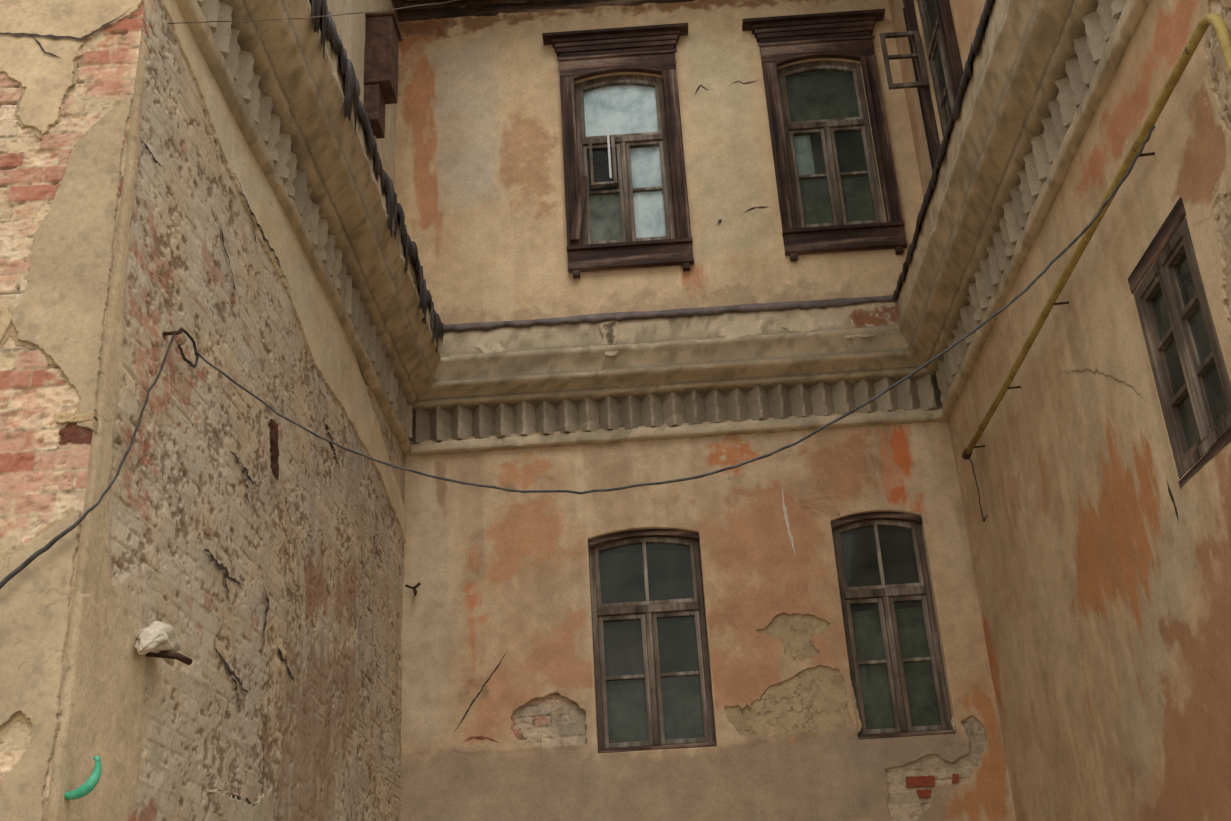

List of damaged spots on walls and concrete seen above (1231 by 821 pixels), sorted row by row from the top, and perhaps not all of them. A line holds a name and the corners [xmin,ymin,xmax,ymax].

crack [0,7,133,59]
flaking render [1204,0,1231,131]
peeling [161,0,406,542]
flaking render [1204,155,1231,354]
peeling [0,0,208,821]
crack [1065,368,1150,401]
flaking render [209,601,364,821]
crack [454,648,509,743]
flaking render [511,694,588,749]
flaking render [885,716,987,821]